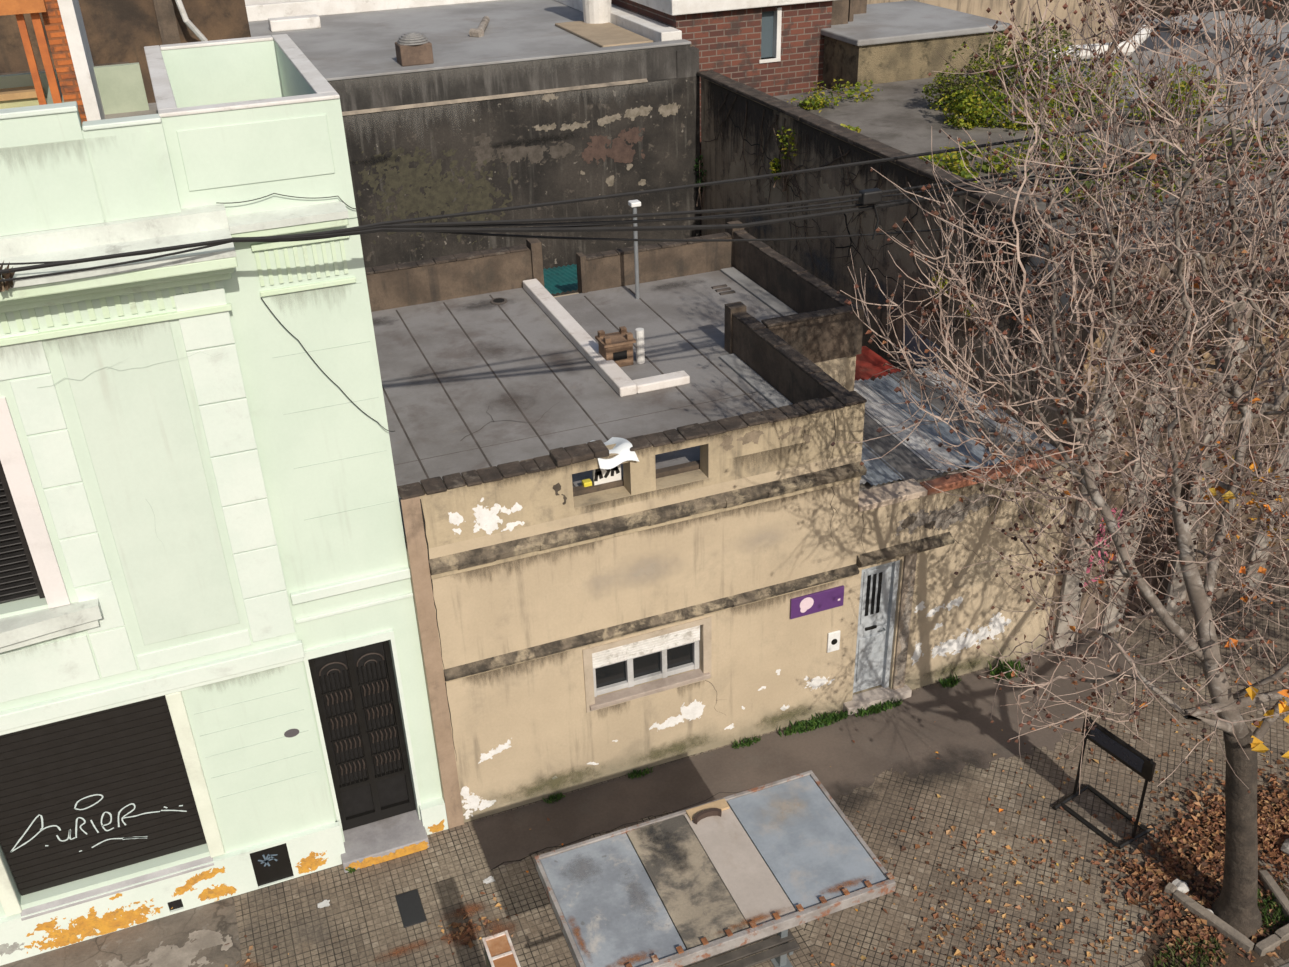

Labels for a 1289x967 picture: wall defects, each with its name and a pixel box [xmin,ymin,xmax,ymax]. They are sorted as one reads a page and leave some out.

damp [606,164,646,187]
peeling [448,498,525,535]
peeling [911,596,1011,666]
peeling [649,699,706,730]
peeling [478,738,512,764]
peeling [460,786,496,819]
peeling [345,819,445,871]
peeling [295,851,328,874]
peeling [0,866,237,956]